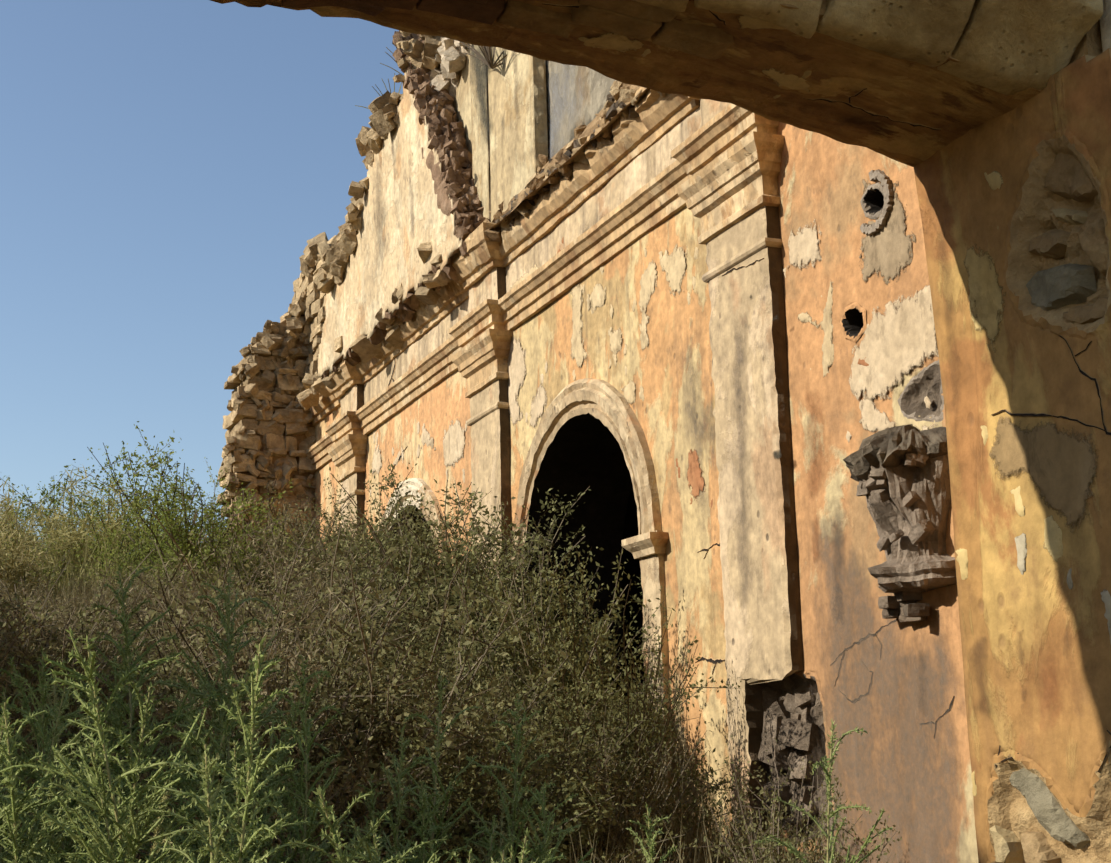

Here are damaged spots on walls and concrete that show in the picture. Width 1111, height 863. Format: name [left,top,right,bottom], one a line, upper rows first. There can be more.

flaking render [762,68,812,99]
flaking render [632,244,699,351]
flaking render [782,219,822,278]
spalling [964,129,1111,353]
flaking render [846,285,944,443]
crack [1052,335,1111,436]
flaking render [369,419,467,495]
flaking render [676,449,713,508]
flaking render [981,409,1097,562]
flaking render [1015,533,1027,575]
spalling [758,671,838,850]
spalling [985,734,1111,863]